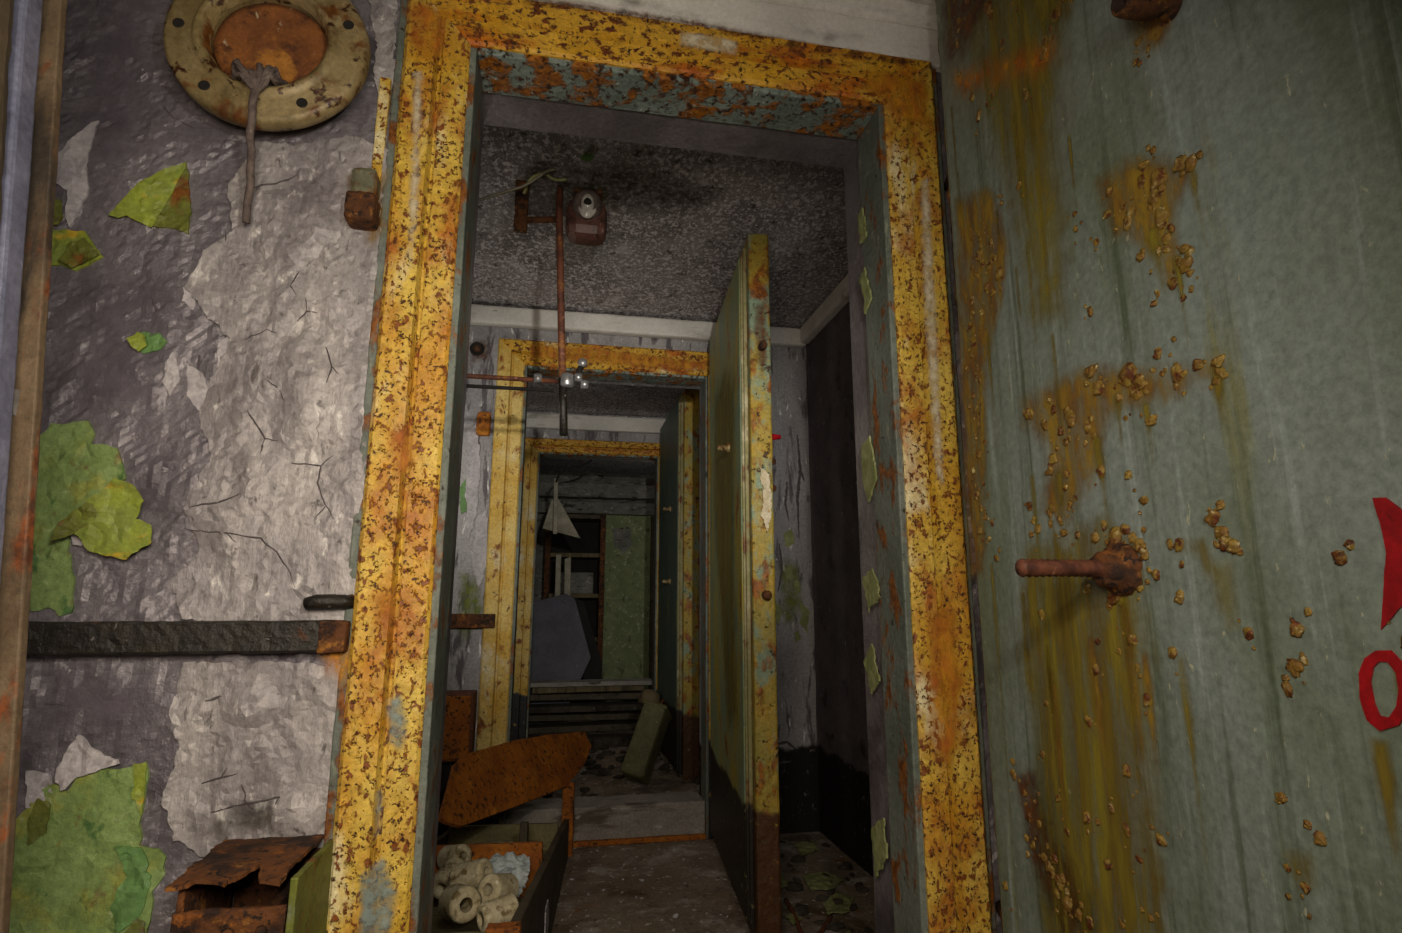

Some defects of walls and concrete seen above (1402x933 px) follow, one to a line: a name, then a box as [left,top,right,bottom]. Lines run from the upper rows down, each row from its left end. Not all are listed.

corrosion [527,0,928,67]
corrosion [1067,144,1204,307]
corrosion [956,181,1024,573]
peeling [30,420,152,616]
corrosion [1166,500,1244,584]
corrosion [1331,539,1355,566]
corrosion [1009,336,1229,933]
corrosion [1238,619,1256,651]
corrosion [1281,607,1312,698]
peeling [9,661,348,933]
corrosion [1303,819,1327,846]
corrosion [1374,741,1394,831]